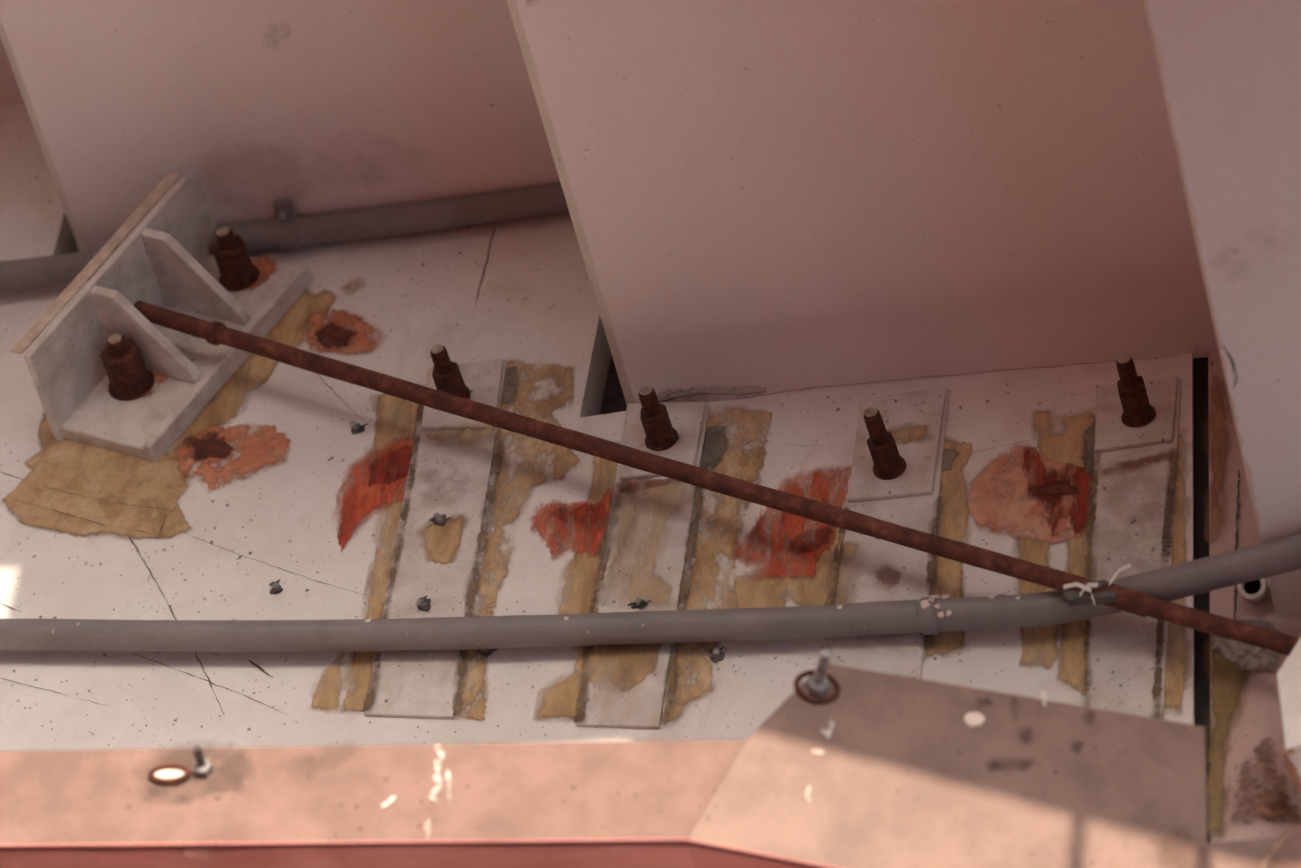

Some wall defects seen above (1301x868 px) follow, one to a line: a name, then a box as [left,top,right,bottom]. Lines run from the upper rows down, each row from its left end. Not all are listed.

rust [304,310,381,354]
peeling [657,386,767,403]
crack [1,472,357,620]
rust [176,425,291,490]
rust [337,439,414,551]
rust [530,478,677,556]
rust [734,507,836,578]
rust [780,467,849,507]
rust [967,446,1092,543]
crack [133,652,289,716]
peeling [964,712,985,727]
rust [1231,738,1301,824]